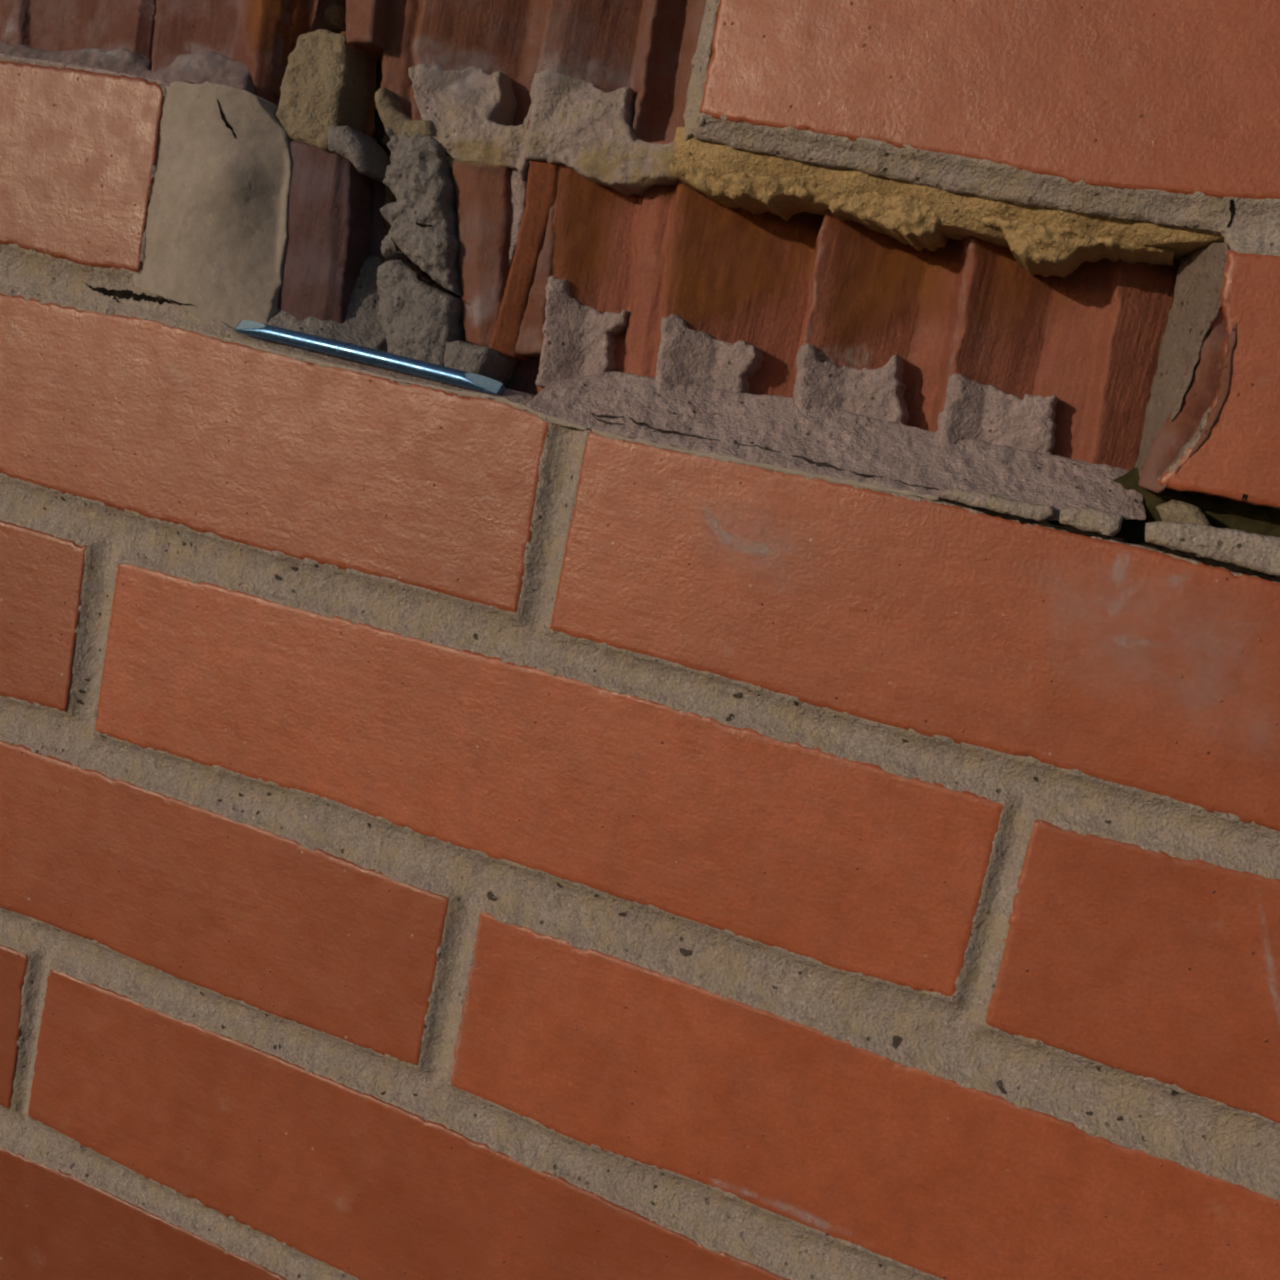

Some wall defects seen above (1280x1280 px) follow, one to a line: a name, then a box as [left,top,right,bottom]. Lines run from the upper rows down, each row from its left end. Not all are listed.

crack [217,99,236,139]
crack [84,283,197,307]
spalling [0,0,1237,521]
crack [592,413,1280,581]